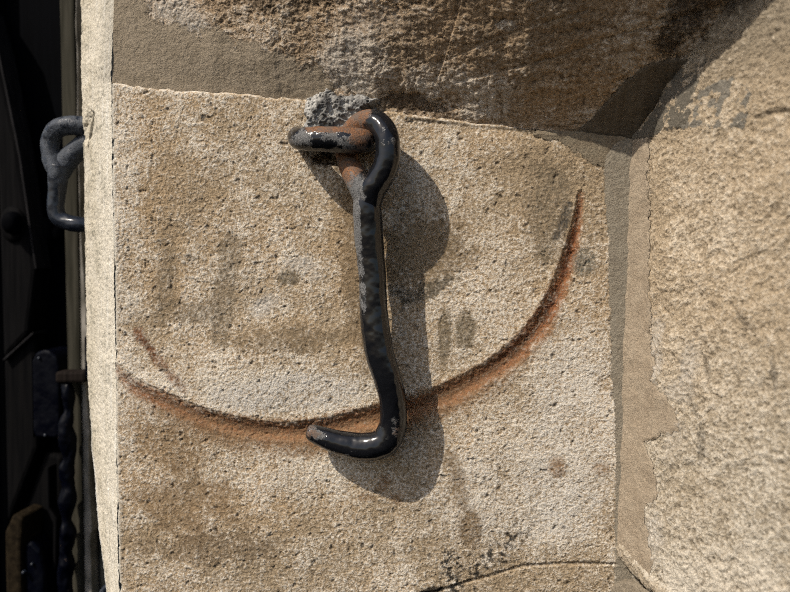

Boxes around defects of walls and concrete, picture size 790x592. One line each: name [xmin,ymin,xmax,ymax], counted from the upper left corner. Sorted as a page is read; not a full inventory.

rust [134,329,158,361]
rust [406,194,583,431]
rust [121,375,380,455]
crack [421,575,489,592]